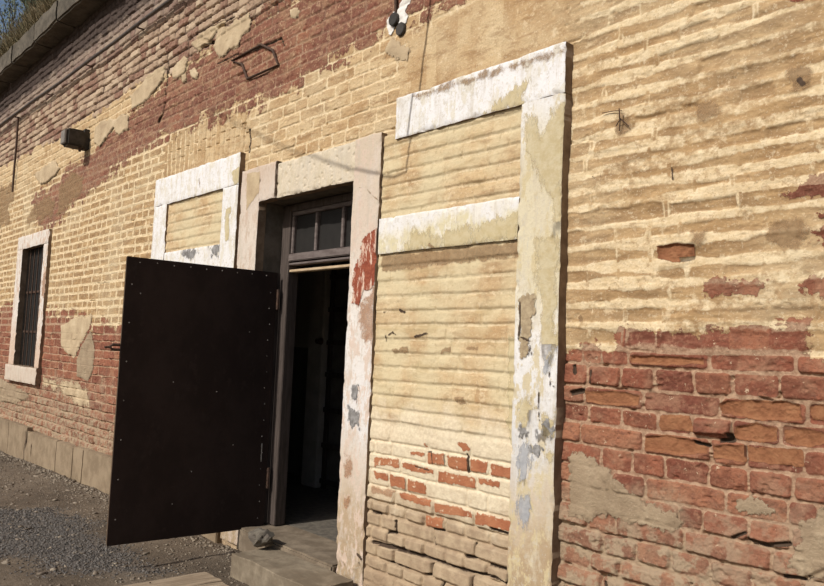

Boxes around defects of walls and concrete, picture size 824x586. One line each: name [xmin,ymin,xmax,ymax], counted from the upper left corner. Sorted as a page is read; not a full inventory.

peeling [31,0,465,230]
peeling [780,173,824,199]
peeling [518,235,560,359]
spalling [657,243,695,262]
peeling [703,275,768,299]
peeling [797,274,824,299]
peeling [0,302,121,456]
peeling [371,442,511,531]
peeling [517,316,824,586]